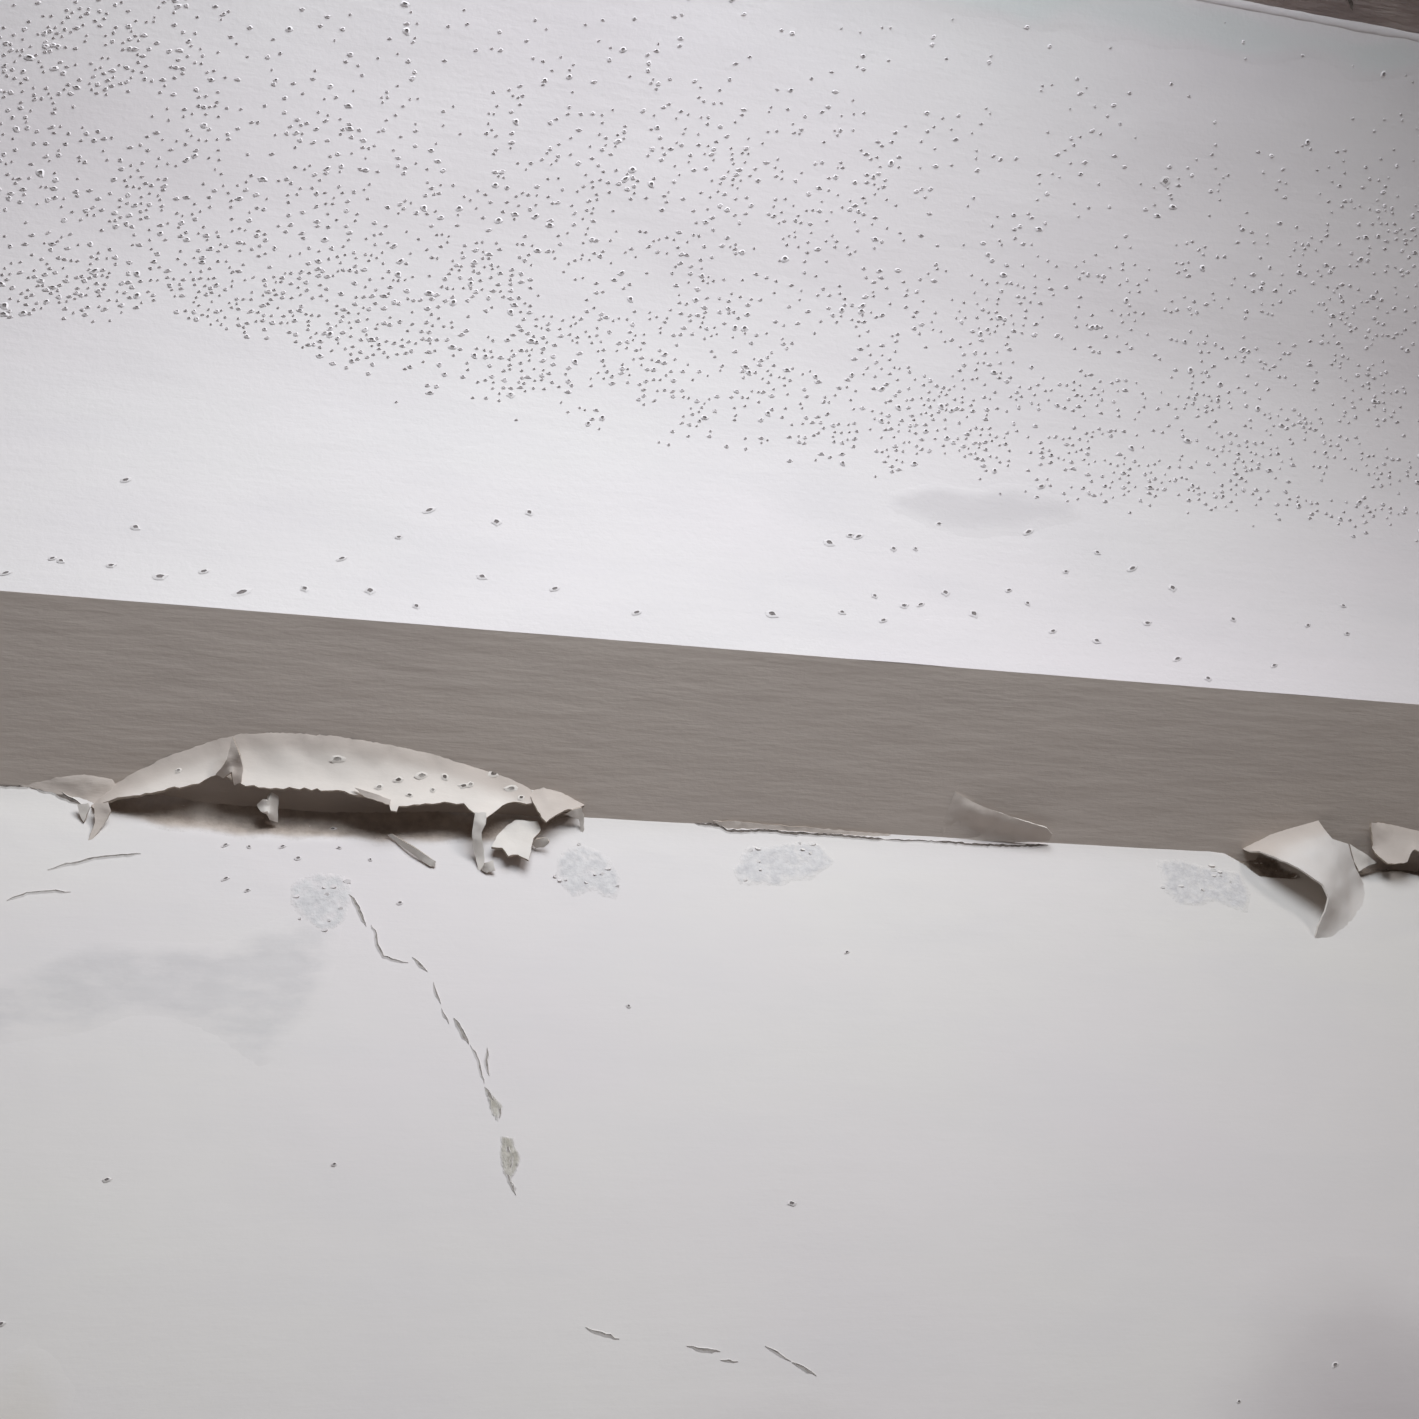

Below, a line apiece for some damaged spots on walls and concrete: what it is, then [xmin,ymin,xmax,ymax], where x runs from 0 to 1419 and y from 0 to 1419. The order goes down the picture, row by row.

spalling [21,774,621,900]
peeling [1156,821,1419,938]
crack [349,894,490,1083]
crack [585,1327,619,1340]
crack [687,1346,816,1376]